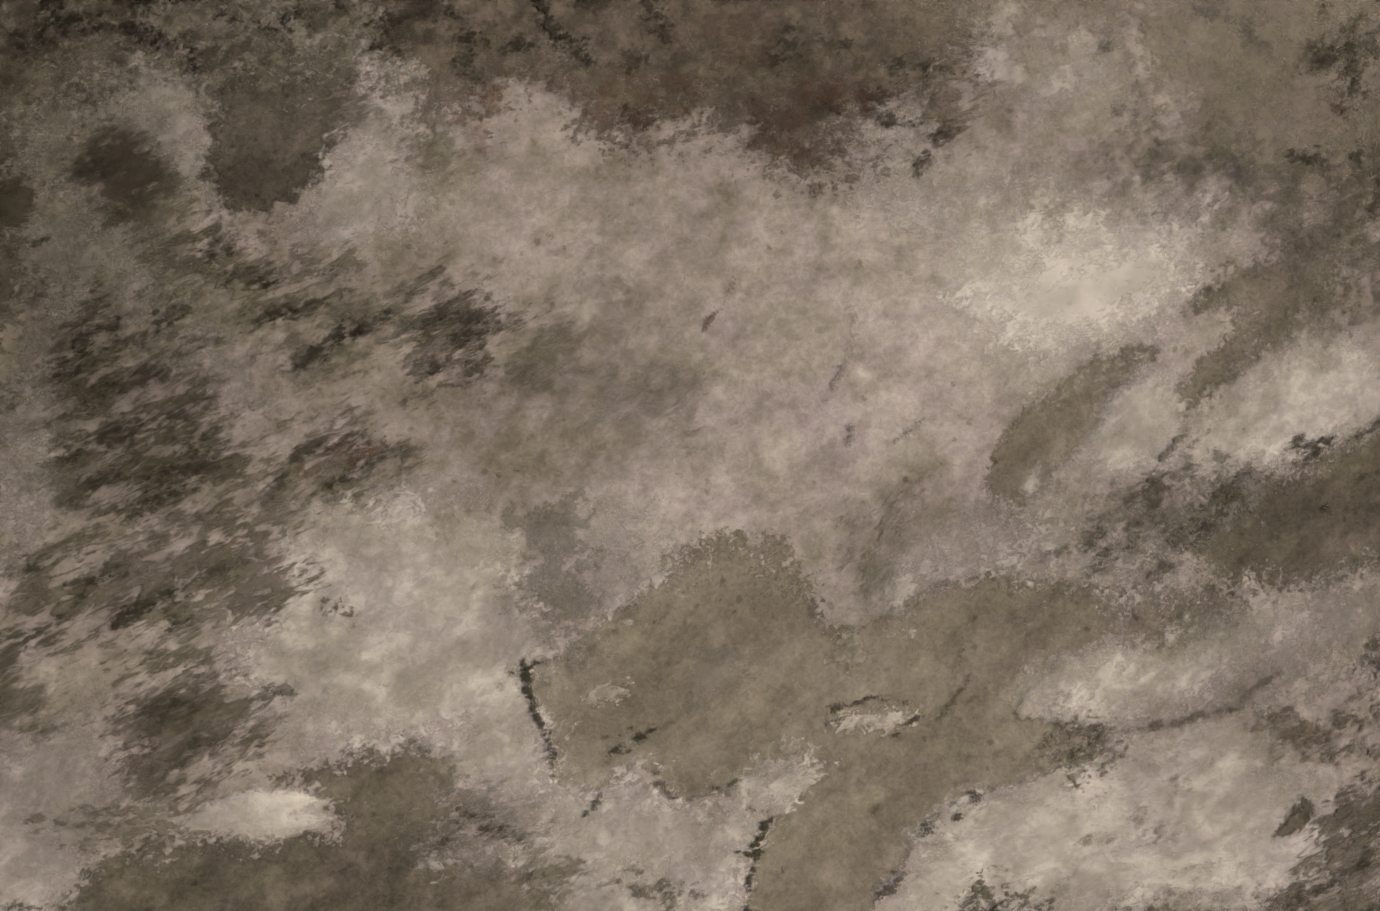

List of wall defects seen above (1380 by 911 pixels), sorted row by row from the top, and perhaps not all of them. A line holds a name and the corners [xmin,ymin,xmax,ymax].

spalling [259,683,298,702]
spalling [320,595,358,628]
crack [508,658,558,777]
water stain [527,706,562,731]
flaking render [530,416,1380,911]
water stain [837,324,1380,911]
flaking render [52,730,563,911]